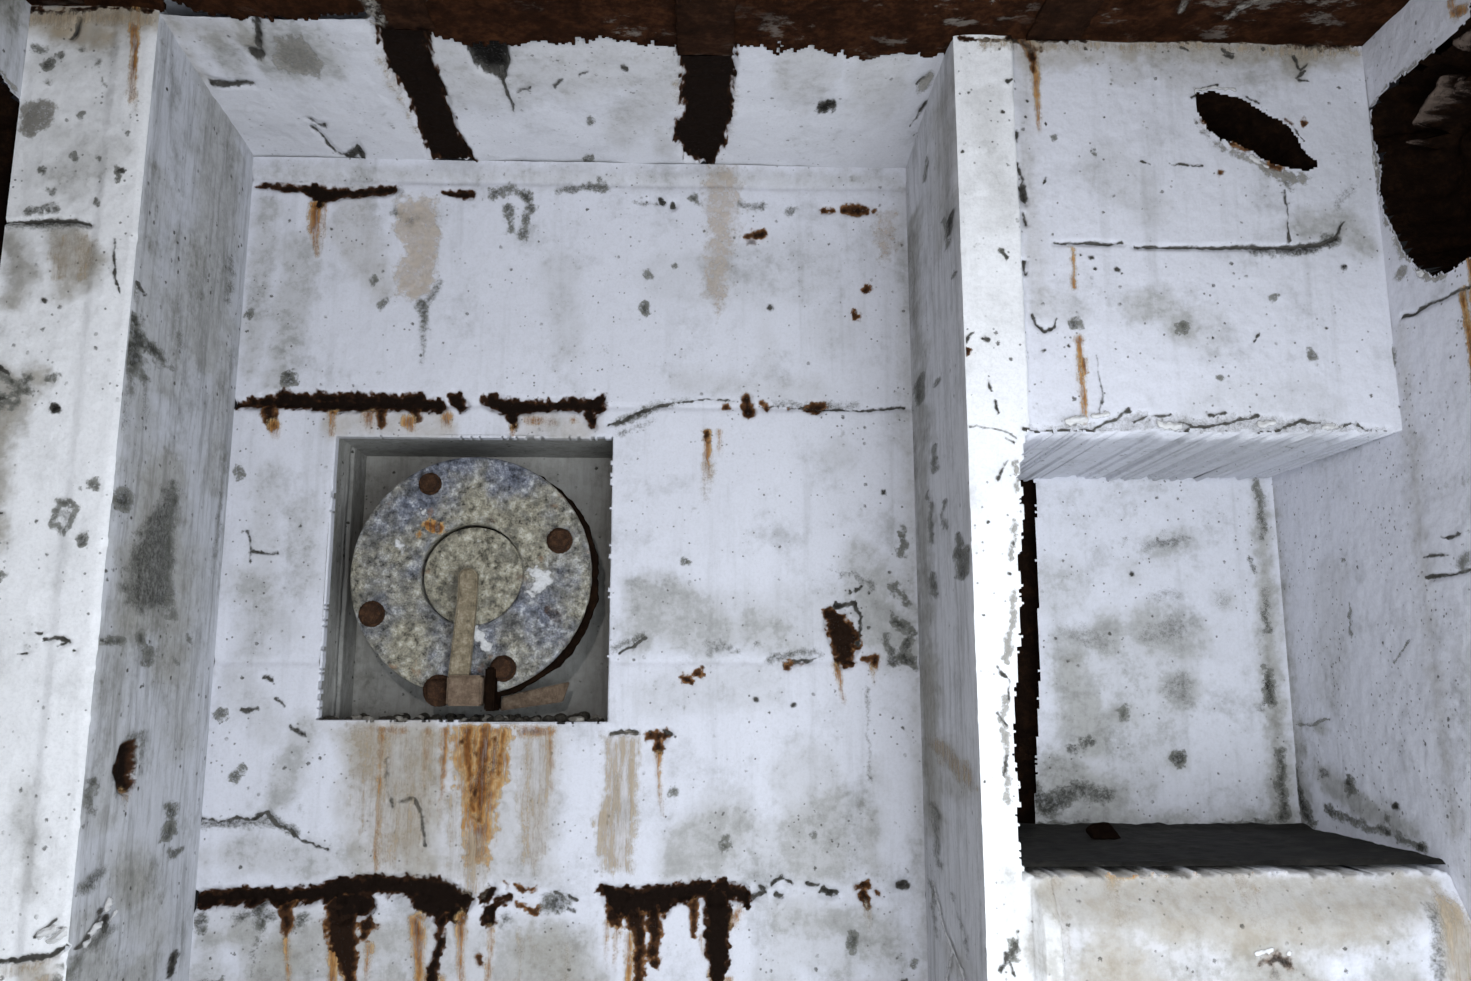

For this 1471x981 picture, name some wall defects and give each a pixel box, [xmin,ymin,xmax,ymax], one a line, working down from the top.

spalling [0,70,55,263]
corrosion [255,182,398,254]
crack [1015,131,1345,276]
hole [1190,84,1317,191]
hole [1370,13,1471,282]
crack [1031,314,1057,333]
corrosion [235,387,607,436]
corrosion [1076,336,1089,424]
spalling [1022,407,1387,434]
hole [112,731,145,799]
corrosion [197,723,516,981]
corrosion [594,876,753,981]